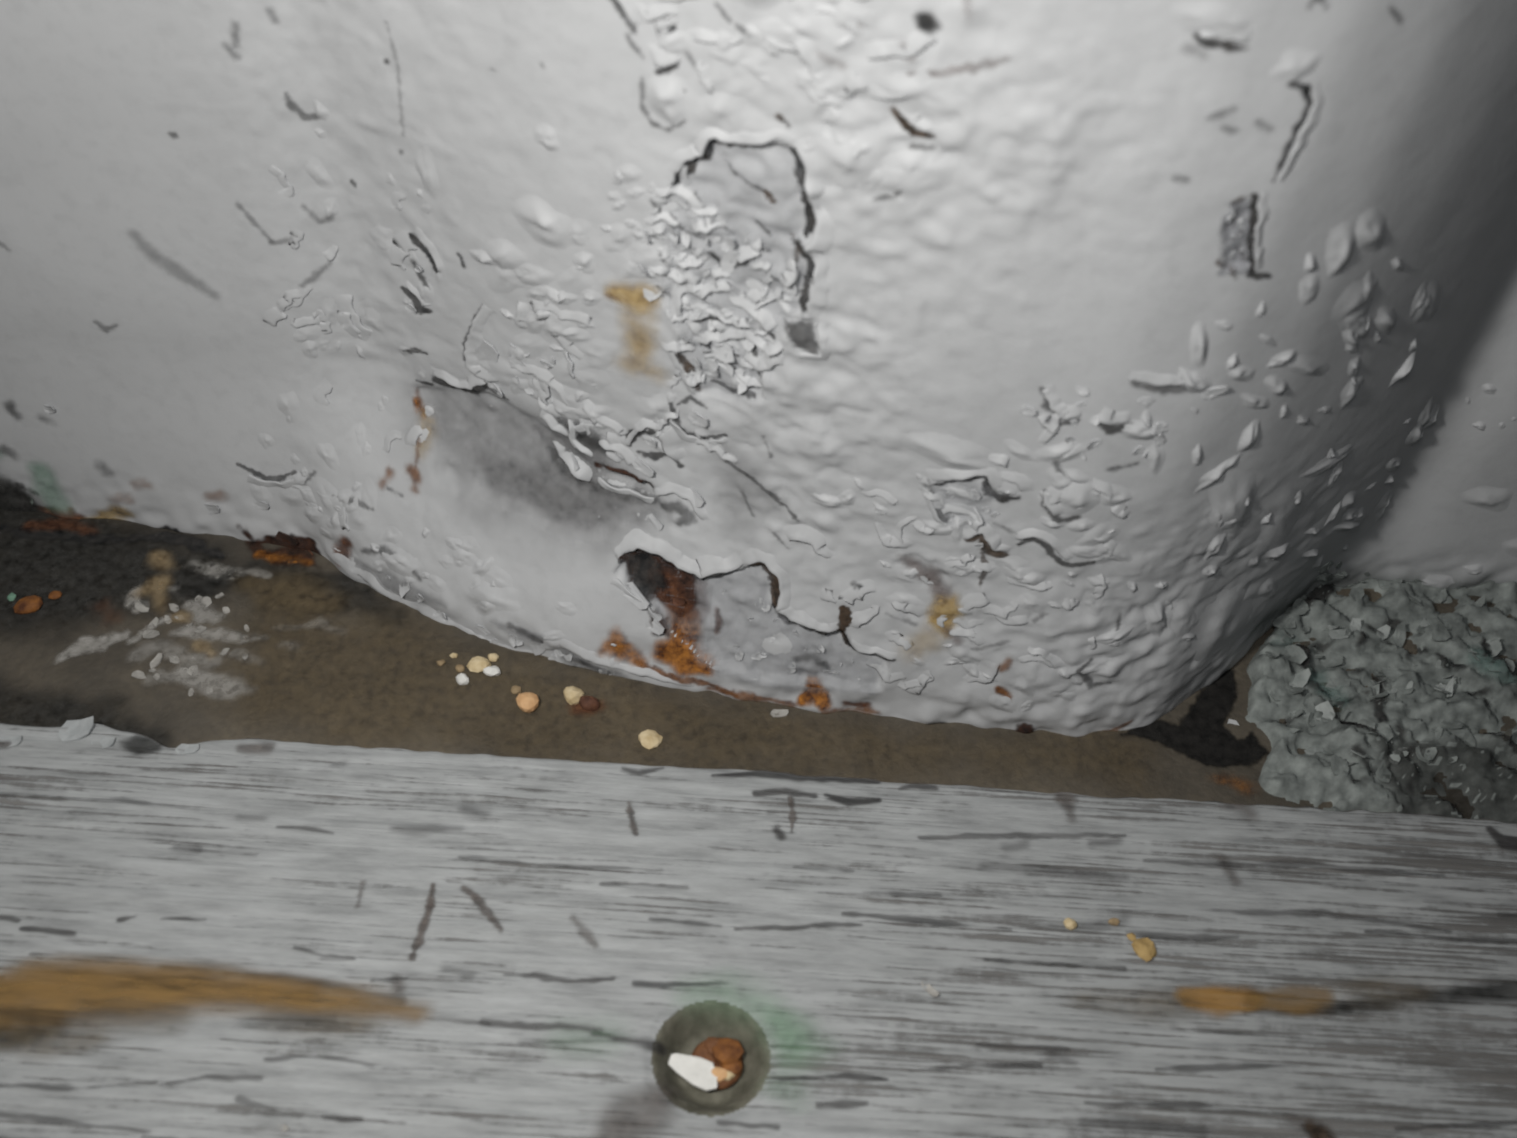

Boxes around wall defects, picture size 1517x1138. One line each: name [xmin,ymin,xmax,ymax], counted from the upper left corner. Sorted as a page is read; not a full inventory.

peeling [401,227,465,314]
rust [609,287,652,311]
peeling [1216,191,1271,279]
peeling [404,304,555,403]
peeling [552,114,898,680]
damp [0,479,403,627]
rust [602,613,877,713]
damp [0,689,164,746]
rust [1016,723,1034,734]